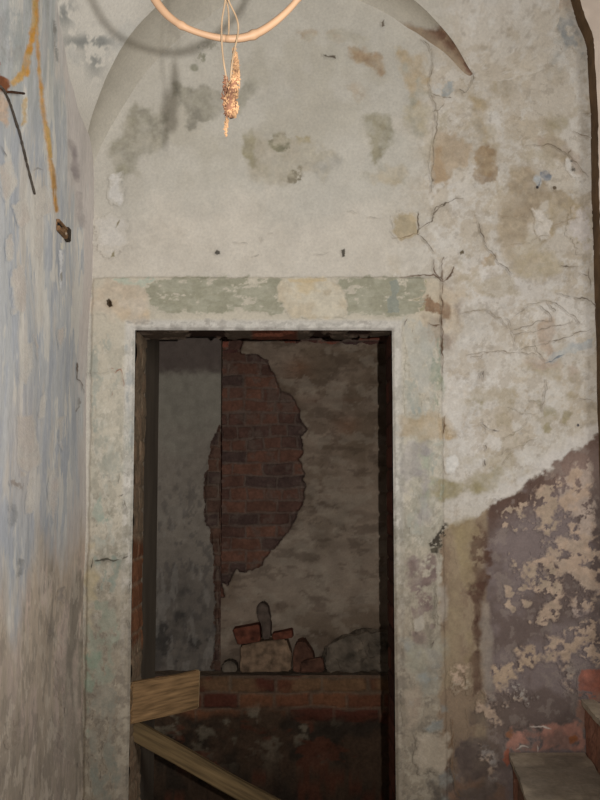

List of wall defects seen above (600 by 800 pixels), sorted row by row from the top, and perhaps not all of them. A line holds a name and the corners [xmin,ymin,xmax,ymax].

rust [0,0,60,214]
water stain [101,75,262,181]
water stain [188,39,221,73]
crack [400,39,596,466]
spalling [112,273,475,671]
peeling [447,456,600,785]
spalling [400,683,456,777]